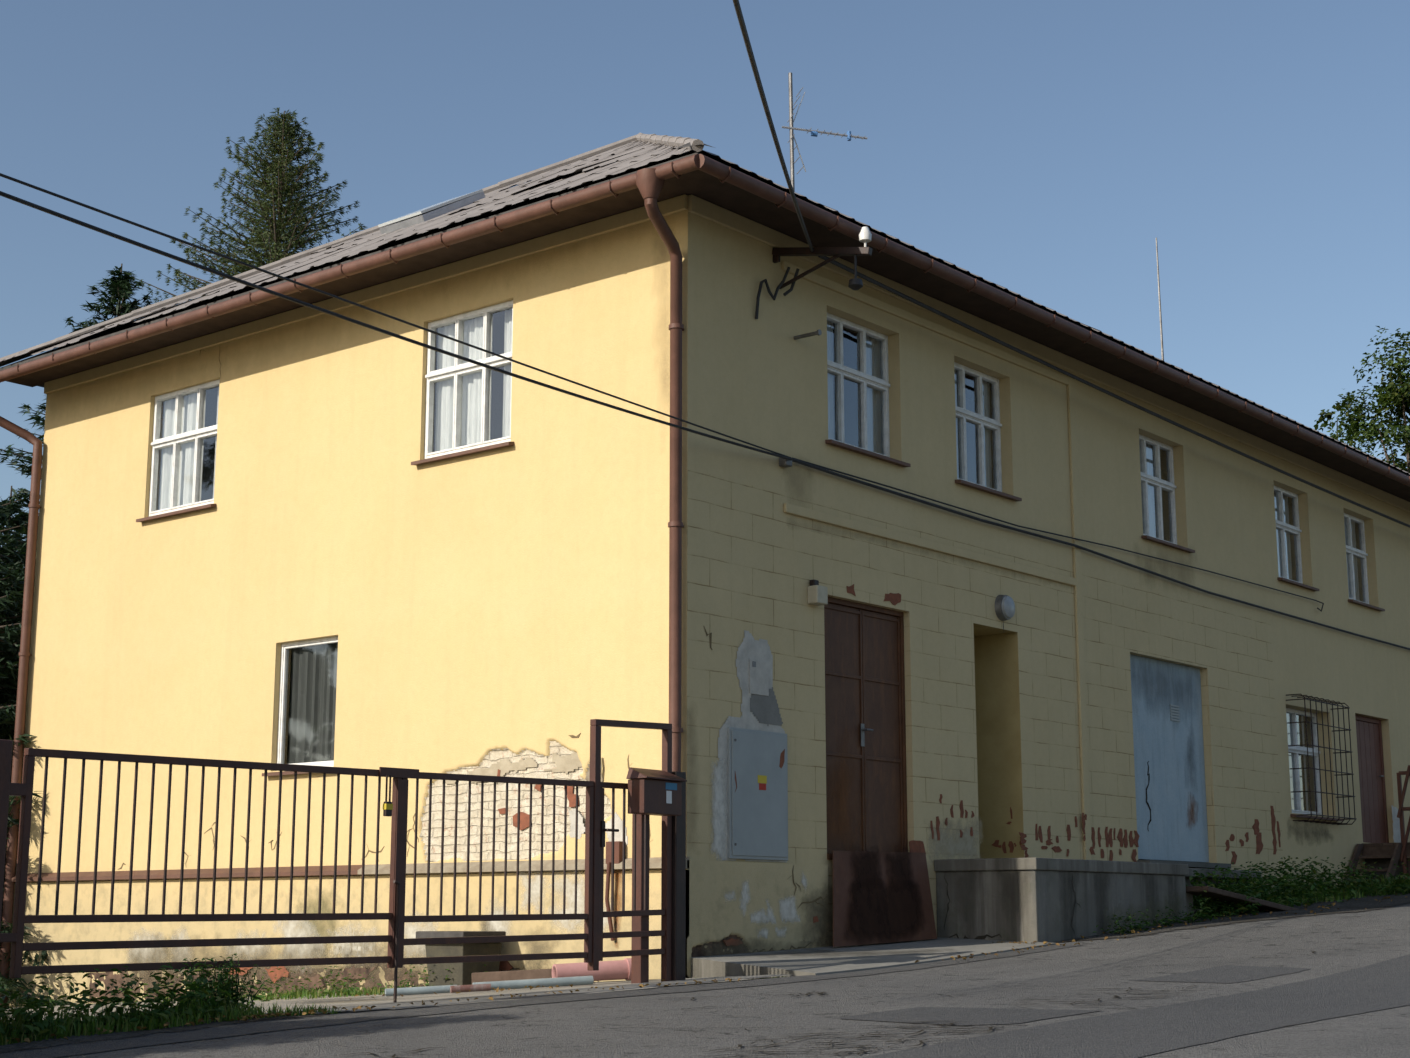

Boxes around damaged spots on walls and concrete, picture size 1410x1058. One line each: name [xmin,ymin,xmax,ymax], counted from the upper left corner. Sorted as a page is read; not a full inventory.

flaking render [419,733,628,862]
peeling [909,794,975,853]
peeling [992,807,1139,862]
peeling [1225,806,1281,864]